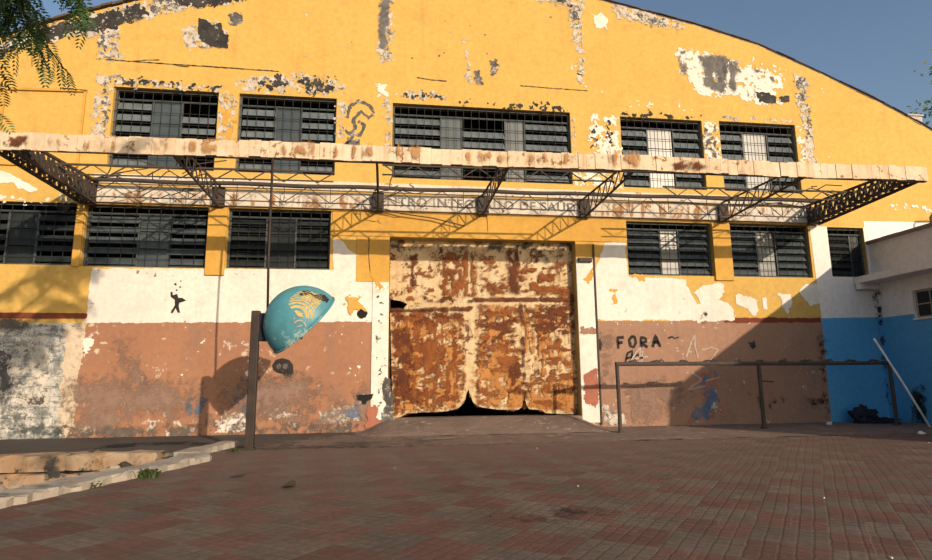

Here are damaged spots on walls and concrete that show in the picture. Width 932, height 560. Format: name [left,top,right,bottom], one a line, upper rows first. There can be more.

spalling [181,12,244,52]
peeling [375,0,396,64]
spalling [675,47,817,163]
rust [184,140,217,153]
rust [282,141,338,157]
rust [466,151,519,163]
rust [609,151,641,167]
rust [673,160,707,170]
peeling [694,283,767,324]
peeling [777,283,820,314]
rust [390,241,577,415]
peeling [0,330,65,431]